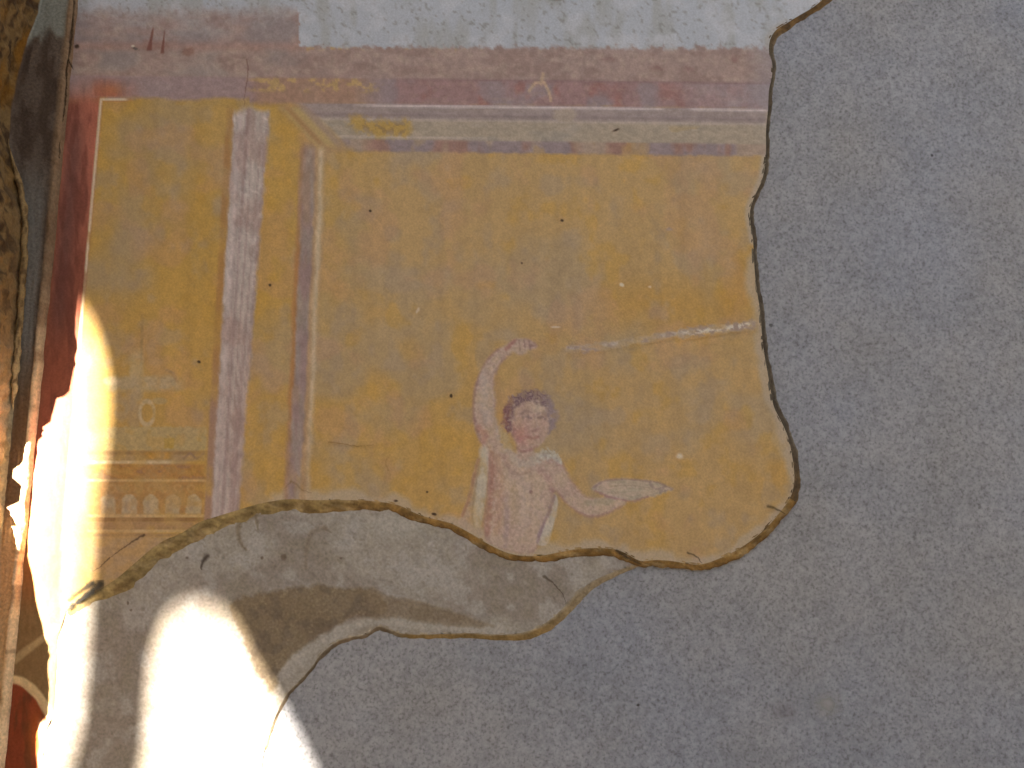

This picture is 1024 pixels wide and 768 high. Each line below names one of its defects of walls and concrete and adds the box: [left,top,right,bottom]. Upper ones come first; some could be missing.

flaking render [49,0,832,768]